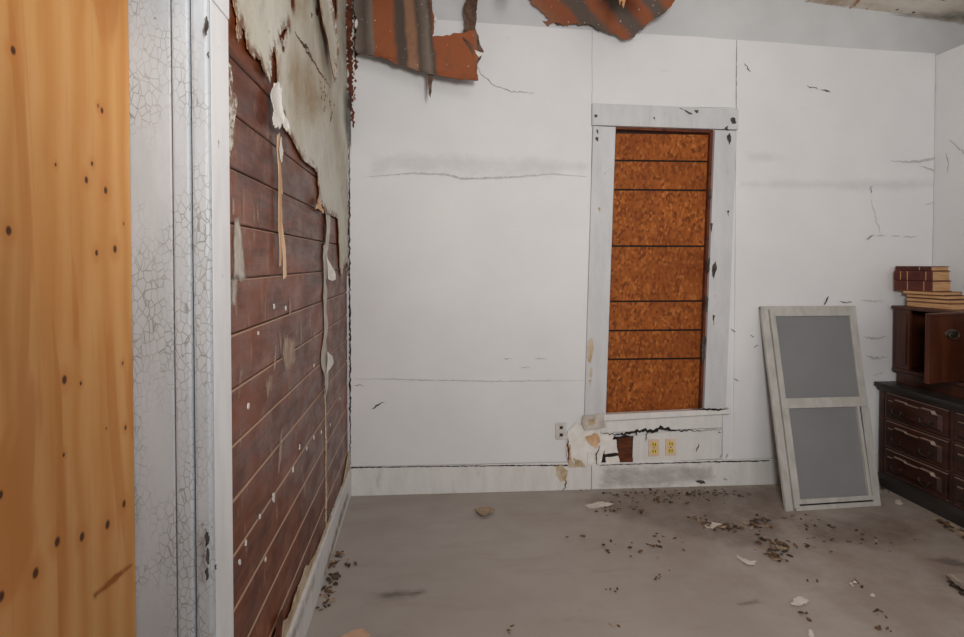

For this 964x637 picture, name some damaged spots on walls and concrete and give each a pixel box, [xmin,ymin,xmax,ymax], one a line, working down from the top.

peeling [311,0,358,105]
peeling [228,55,238,168]
peeling [270,82,291,162]
peeling [231,220,245,305]
flaking render [274,197,336,637]
spalling [566,413,634,469]